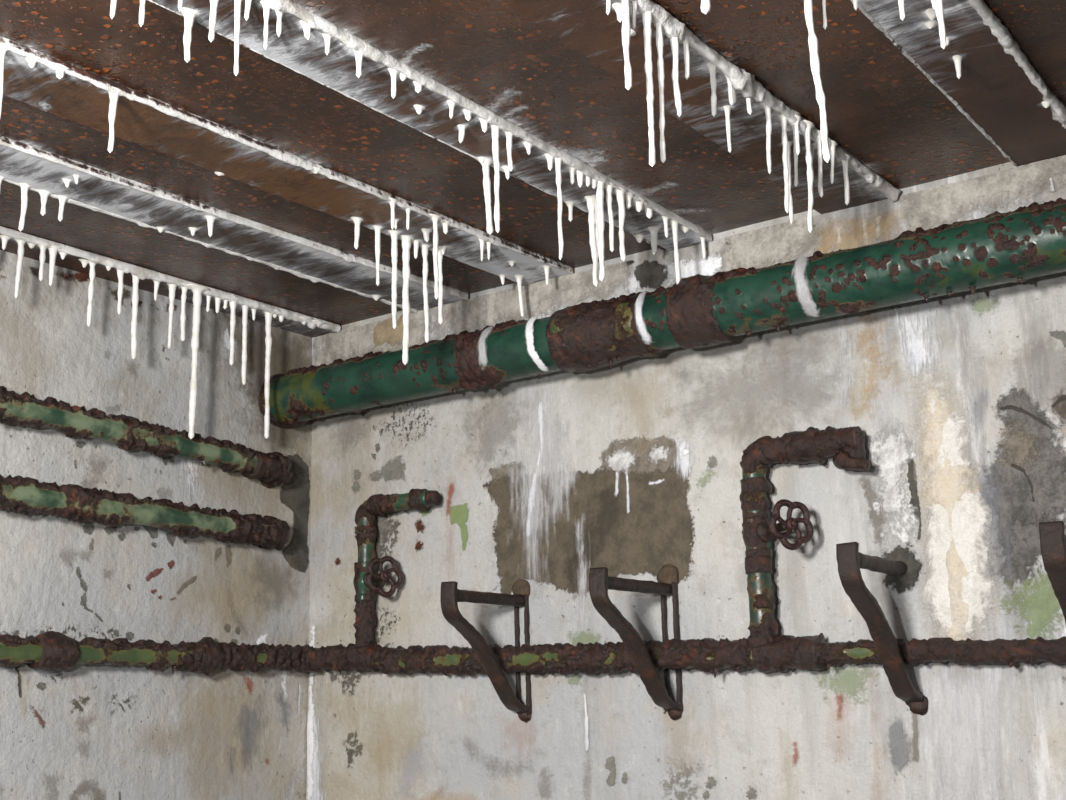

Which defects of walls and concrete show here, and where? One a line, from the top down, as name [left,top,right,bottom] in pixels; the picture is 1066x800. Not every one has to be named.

water stain [0,226,341,332]
water stain [227,317,312,401]
water stain [0,36,573,313]
water stain [148,0,478,160]
water stain [262,0,712,241]
water stain [624,273,651,344]
water stain [604,220,725,287]
water stain [629,0,901,201]
water stain [851,0,1017,167]
water stain [969,0,1066,129]
peeling [1049,330,1066,347]
spalling [983,388,1066,588]